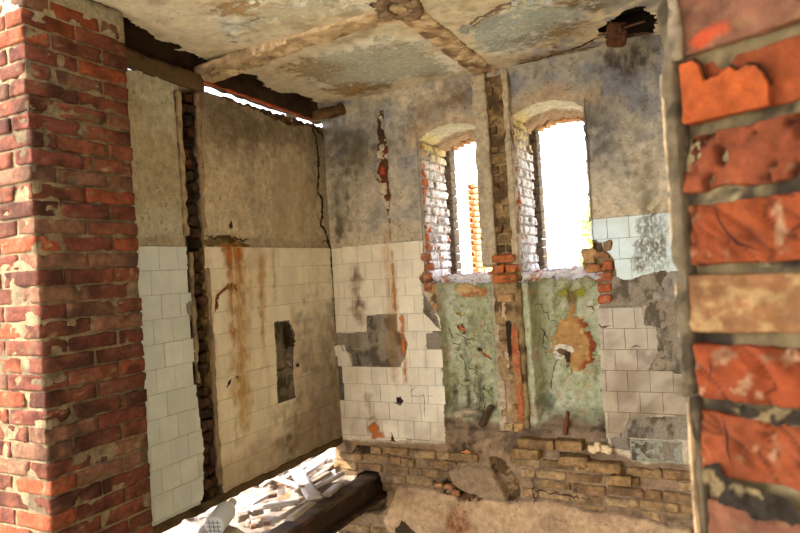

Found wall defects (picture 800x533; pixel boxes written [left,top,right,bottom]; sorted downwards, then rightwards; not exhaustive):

damp [280,58,389,95]
flaking render [377,110,391,213]
crack [312,129,336,327]
corrosion [222,243,244,317]
peeling [272,321,296,403]
peeling [336,314,408,367]
corrosion [392,264,405,355]
peeling [544,293,601,388]
peeling [581,240,683,374]
peeling [611,416,689,464]